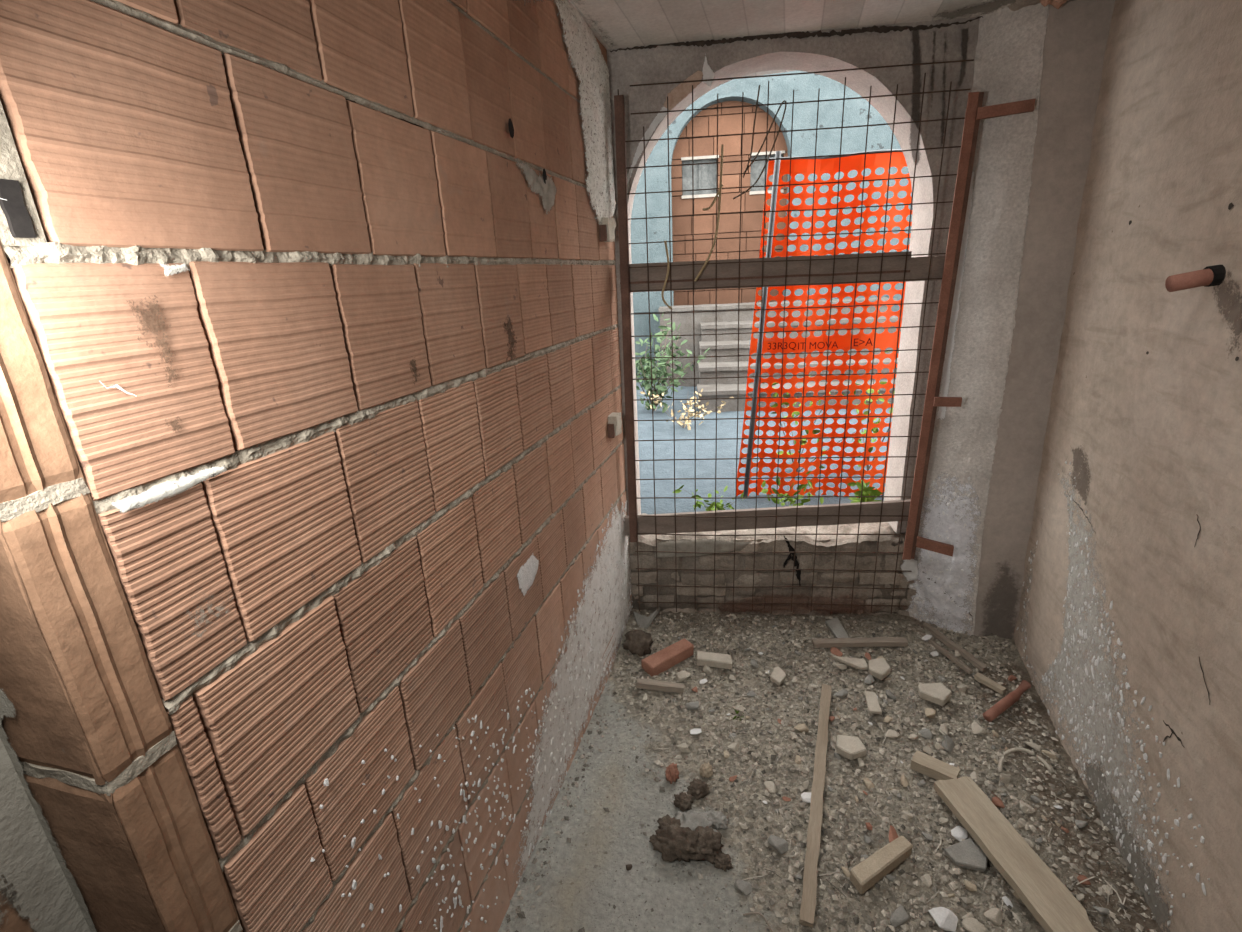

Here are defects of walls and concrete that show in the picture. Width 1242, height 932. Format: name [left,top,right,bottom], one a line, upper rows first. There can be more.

leakage [908,461,1210,932]